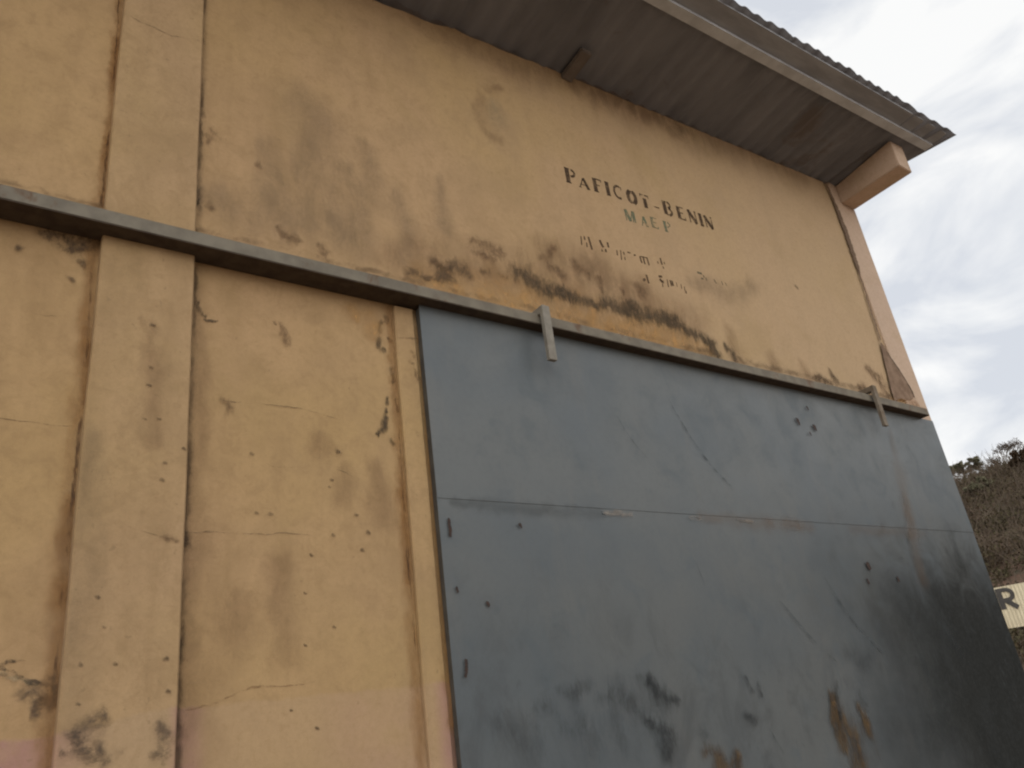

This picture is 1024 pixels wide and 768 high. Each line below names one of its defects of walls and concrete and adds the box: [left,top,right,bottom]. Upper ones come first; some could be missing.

damp [408,245,737,361]